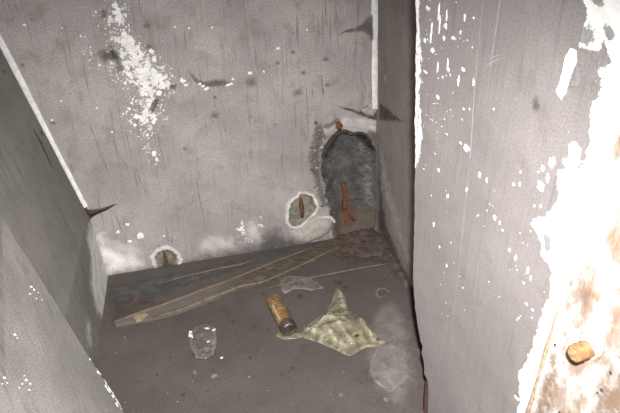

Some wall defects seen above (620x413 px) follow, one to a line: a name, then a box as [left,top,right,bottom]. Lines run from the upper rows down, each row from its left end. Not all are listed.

crack [340,103,399,120]
peeling [414,0,461,170]
efflorescence [86,224,150,316]
spalling [148,245,184,268]
spalling [284,116,376,238]
peeling [514,0,620,413]